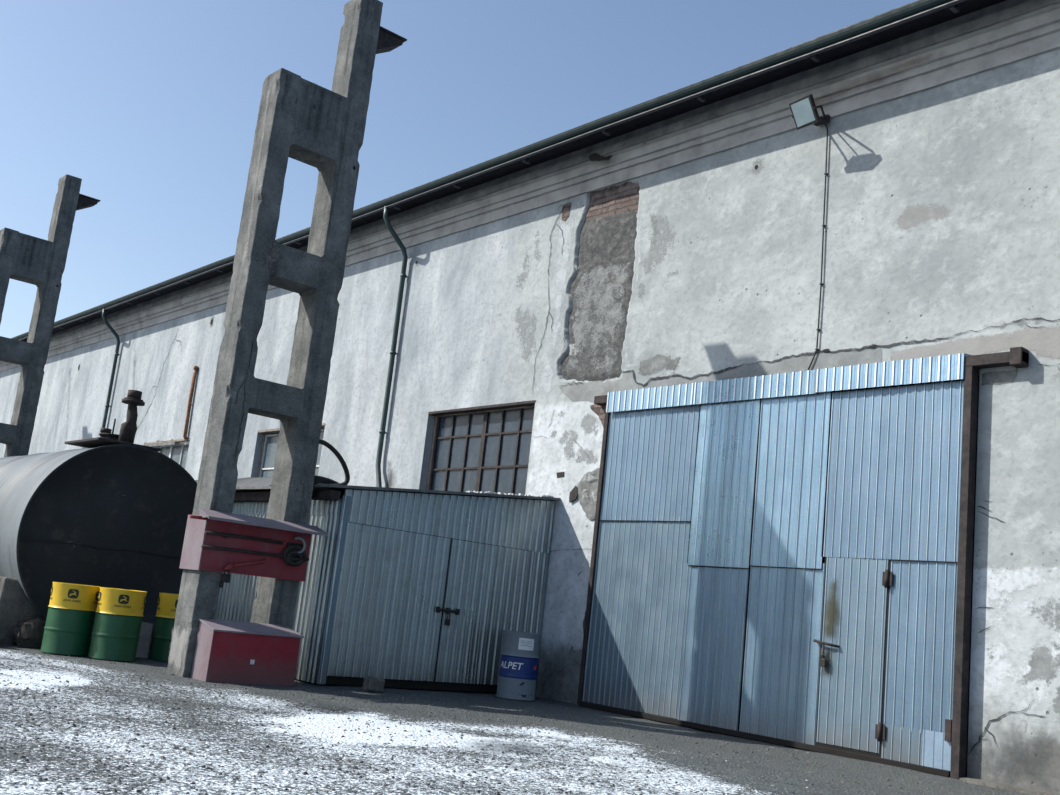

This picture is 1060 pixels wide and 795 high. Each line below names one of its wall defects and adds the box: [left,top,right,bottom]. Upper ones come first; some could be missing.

crack [532,198,570,390]
flaking render [515,307,536,361]
flaking render [536,182,949,520]
crack [882,317,1060,348]
peeling [1032,603,1060,628]
peeling [1022,644,1060,715]
crack [968,699,1044,755]